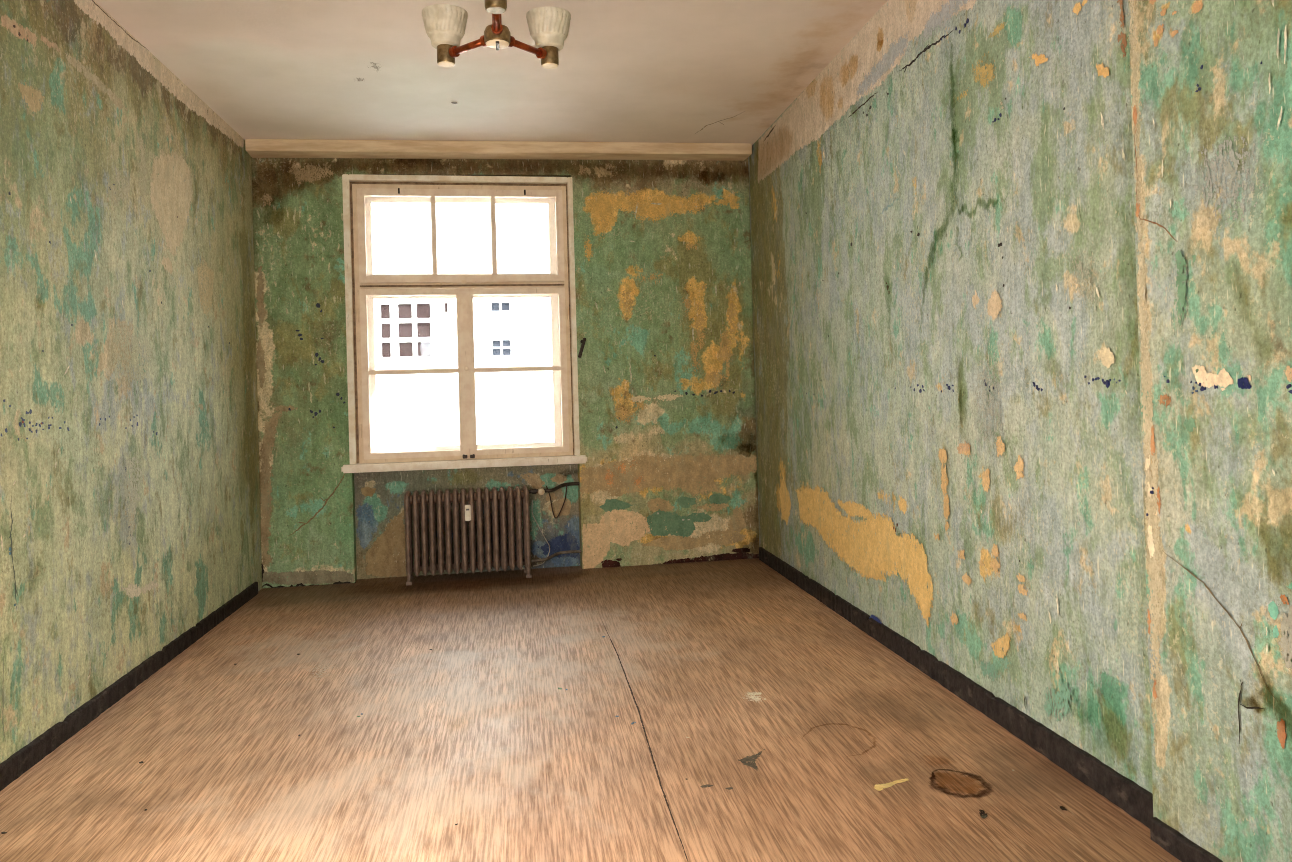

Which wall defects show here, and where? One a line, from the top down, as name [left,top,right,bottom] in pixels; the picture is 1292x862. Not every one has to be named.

peeling [757,0,977,183]
crack [848,18,969,118]
peeling [583,189,739,261]
spalling [972,284,1004,320]
peeling [1,399,69,441]
spalling [1084,347,1121,388]
spalling [1129,0,1203,746]
spalling [1190,365,1252,394]
peeling [520,450,759,569]
peeling [779,349,1024,626]
peeling [979,632,1011,682]
crack [1162,550,1275,744]